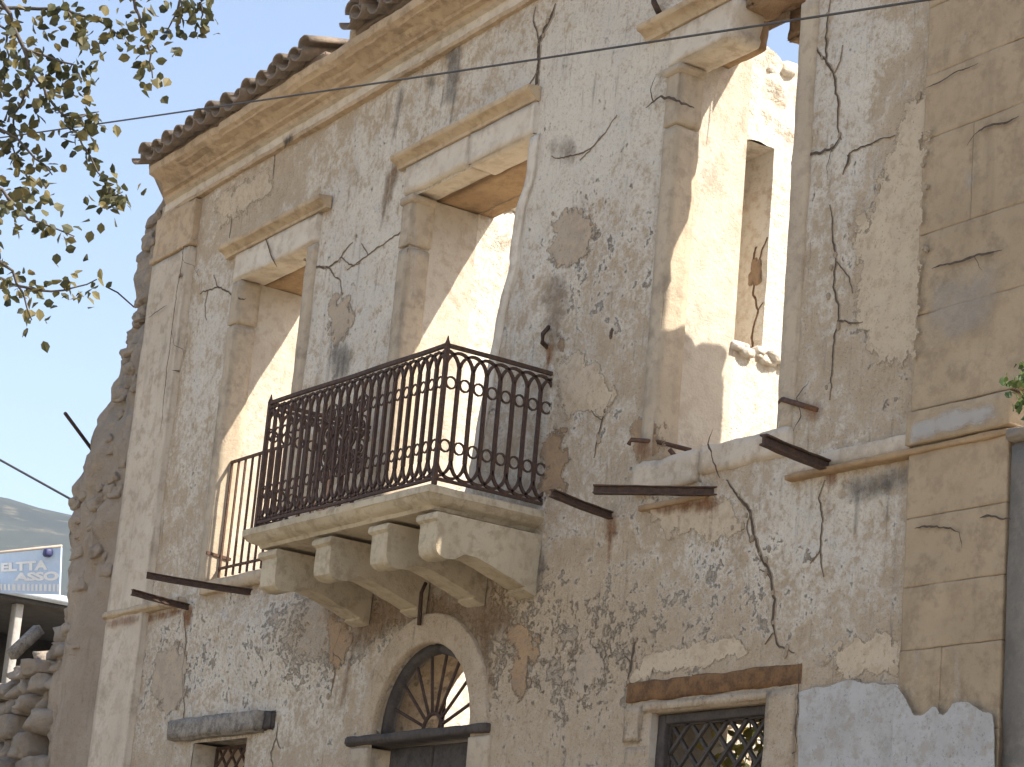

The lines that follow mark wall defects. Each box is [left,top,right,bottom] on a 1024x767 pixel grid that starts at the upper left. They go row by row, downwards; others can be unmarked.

crack [529,3,556,86]
crack [810,0,895,175]
spalling [325,293,355,347]
crack [303,232,400,294]
spalling [546,207,599,268]
crack [750,237,768,348]
crack [793,205,863,431]
peeling [843,87,931,368]
spalling [537,420,570,499]
crack [810,480,826,577]
crack [707,432,799,754]
spalling [506,618,541,702]